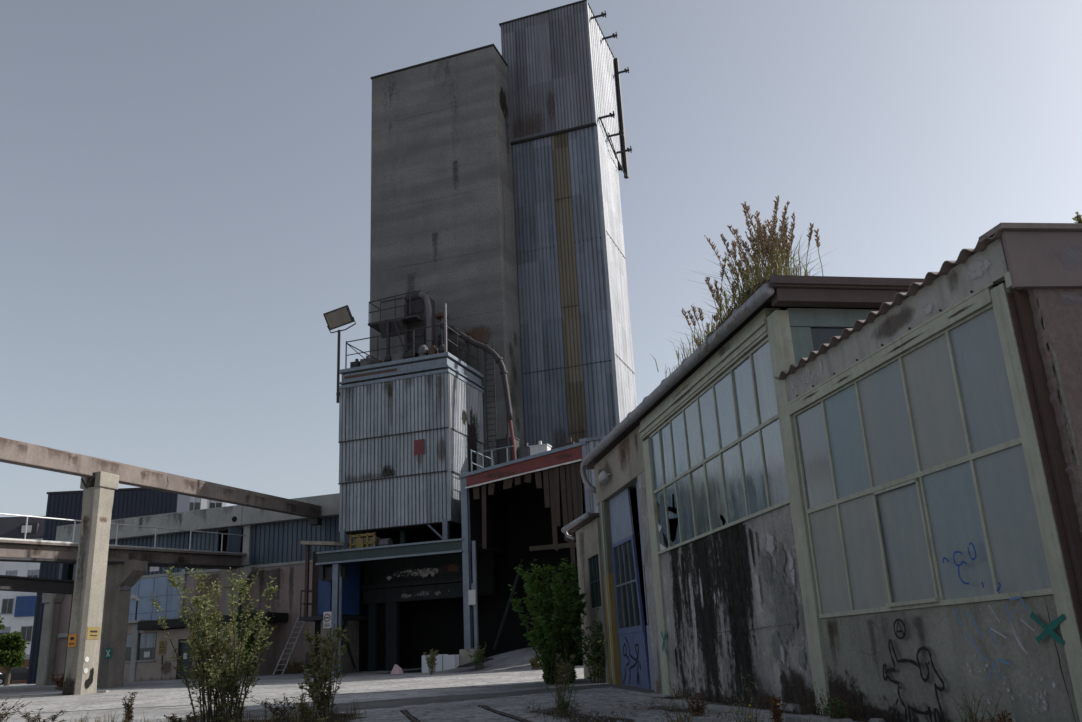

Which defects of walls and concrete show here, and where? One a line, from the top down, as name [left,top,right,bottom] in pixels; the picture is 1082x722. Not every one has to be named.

damp [669,523,817,714]
damp [828,671,967,722]